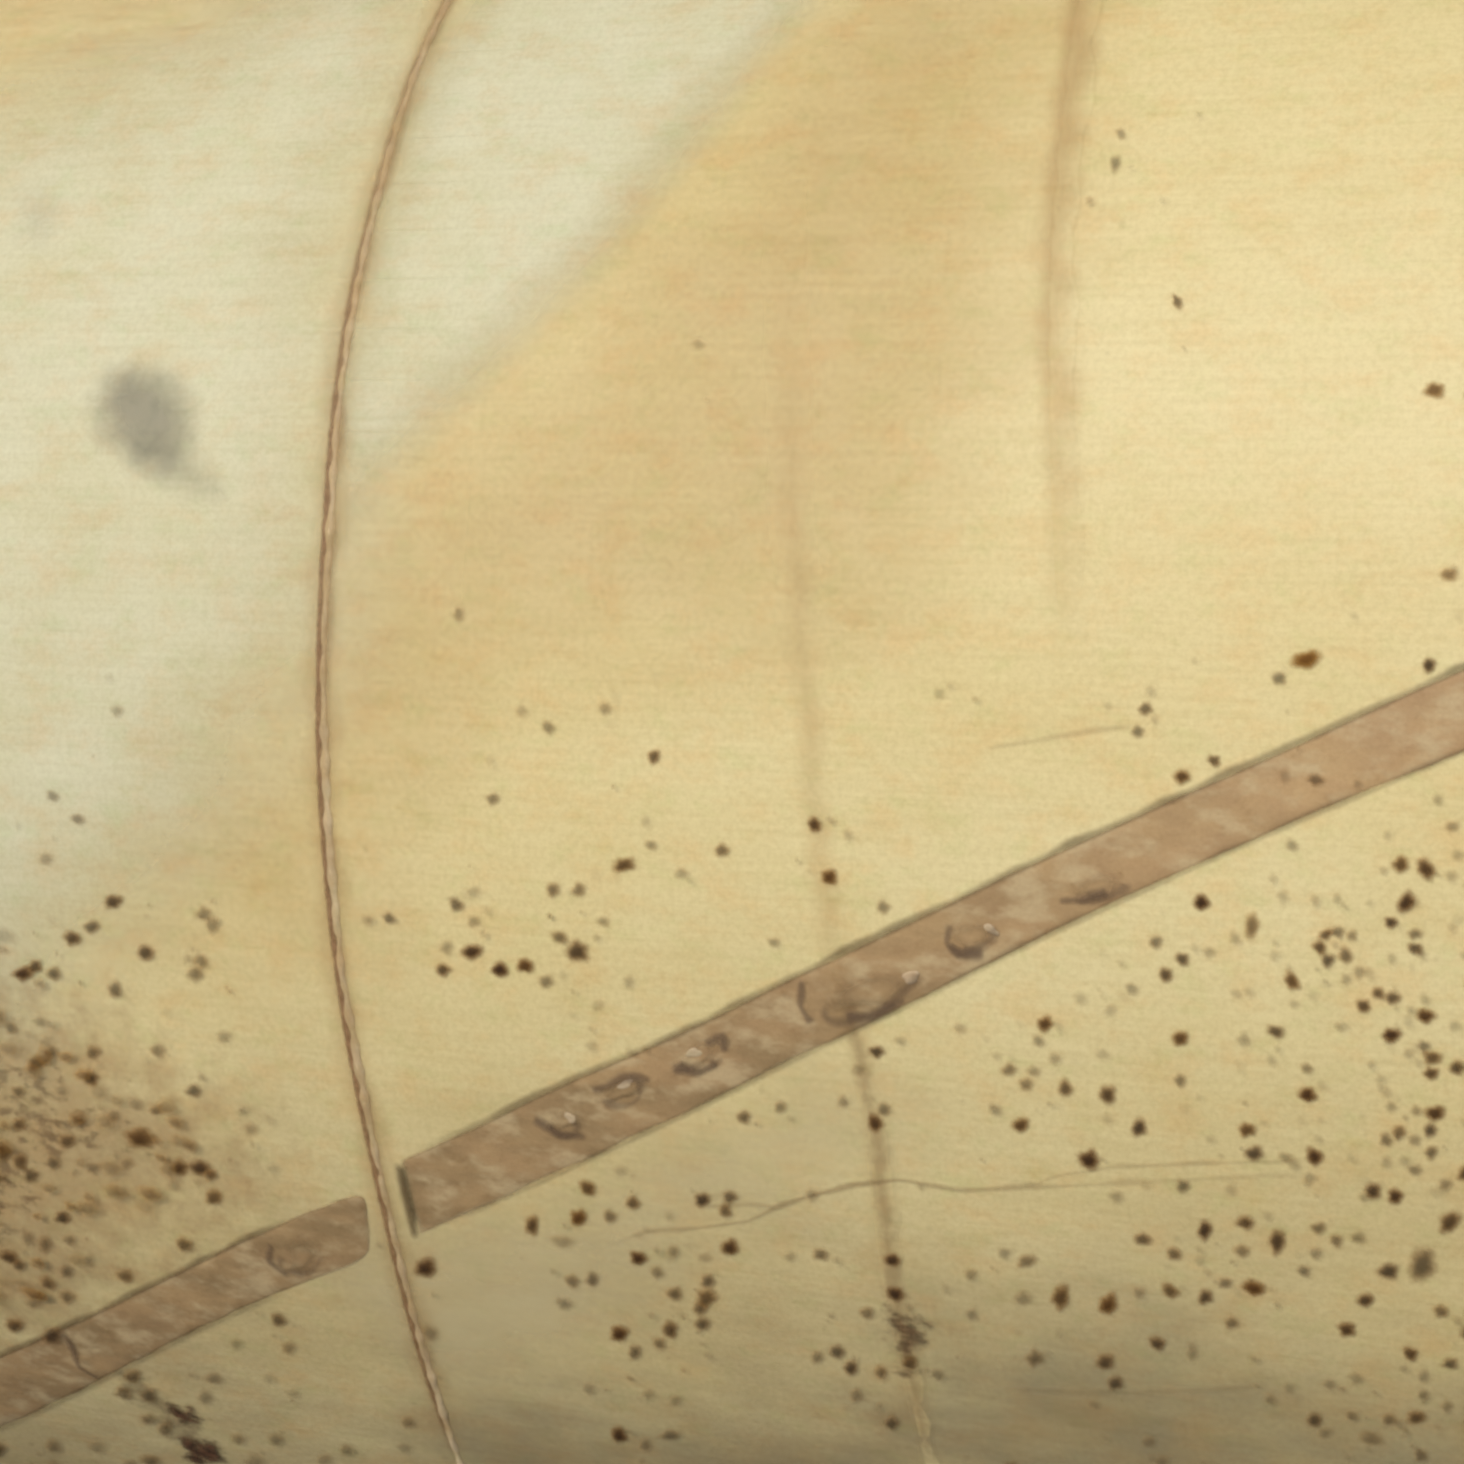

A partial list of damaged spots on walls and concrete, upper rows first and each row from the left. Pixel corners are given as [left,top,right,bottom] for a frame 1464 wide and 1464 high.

corrosion [1293,651,1318,667]
corrosion [1393,857,1433,878]
corrosion [1194,895,1209,909]
corrosion [1385,893,1414,927]
corrosion [554,933,586,959]
corrosion [13,961,57,980]
corrosion [492,959,532,976]
corrosion [1424,1052,1462,1078]
corrosion [1425,1106,1443,1156]
corrosion [128,1128,219,1203]
corrosion [1079,1150,1098,1169]
corrosion [1366,1185,1402,1203]